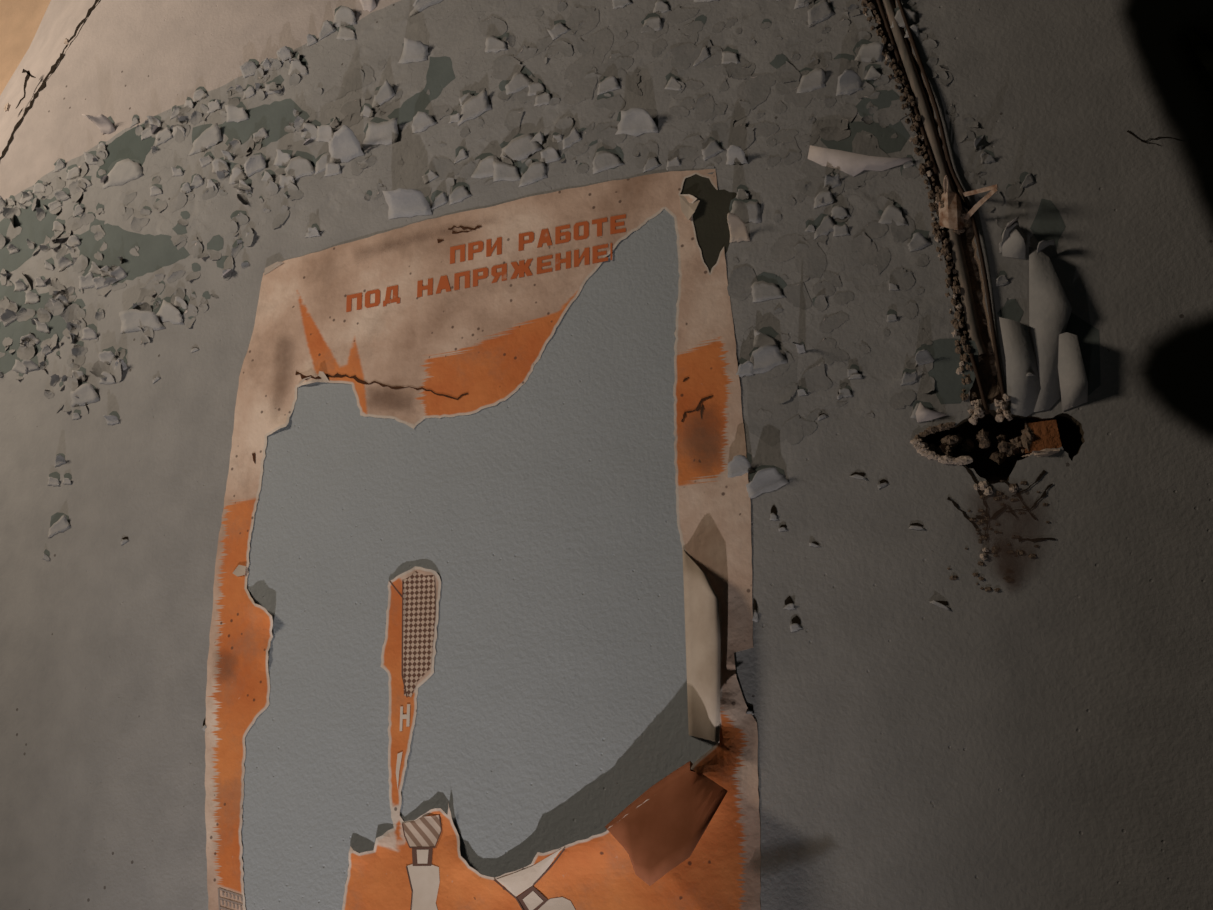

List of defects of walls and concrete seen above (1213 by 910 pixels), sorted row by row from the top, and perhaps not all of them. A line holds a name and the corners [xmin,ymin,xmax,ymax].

peeling [0,0,953,445]
peeling [889,103,1101,592]
peeling [47,453,72,486]
peeling [727,452,789,531]
peeling [849,472,889,489]
peeling [42,512,71,561]
peeling [783,596,802,632]